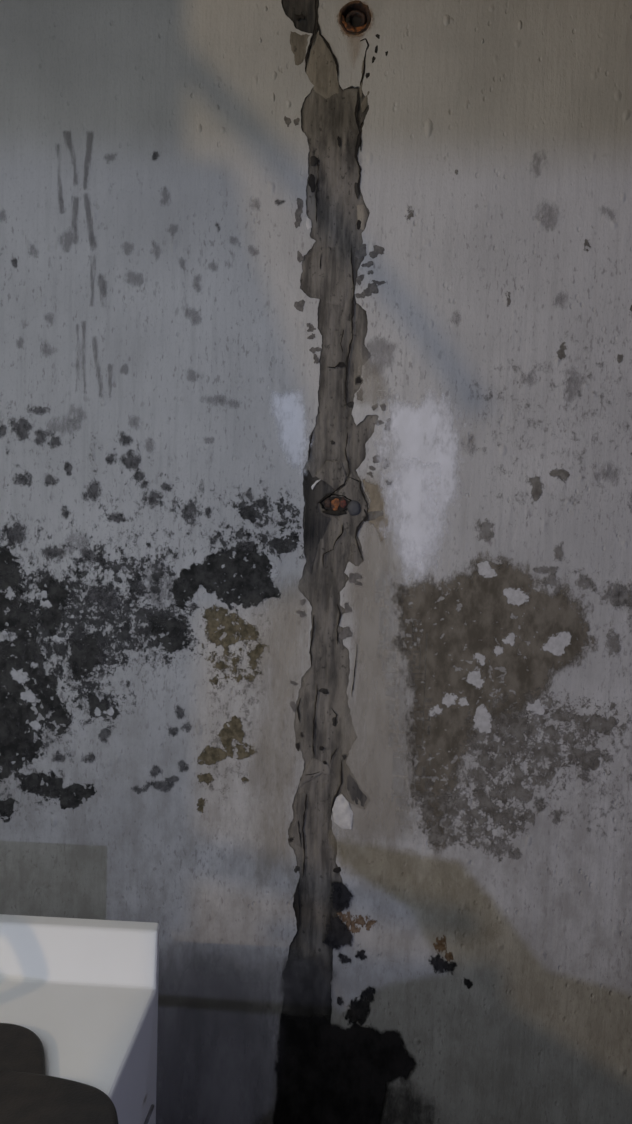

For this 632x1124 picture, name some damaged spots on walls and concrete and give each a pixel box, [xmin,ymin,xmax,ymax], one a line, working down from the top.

spalling [281,0,388,99]
peeling [294,156,319,228]
peeling [354,244,386,298]
peeling [294,300,321,364]
damp [0,405,74,453]
peeling [347,375,391,431]
spalling [303,455,392,586]
damp [0,433,304,822]
damp [363,392,632,862]